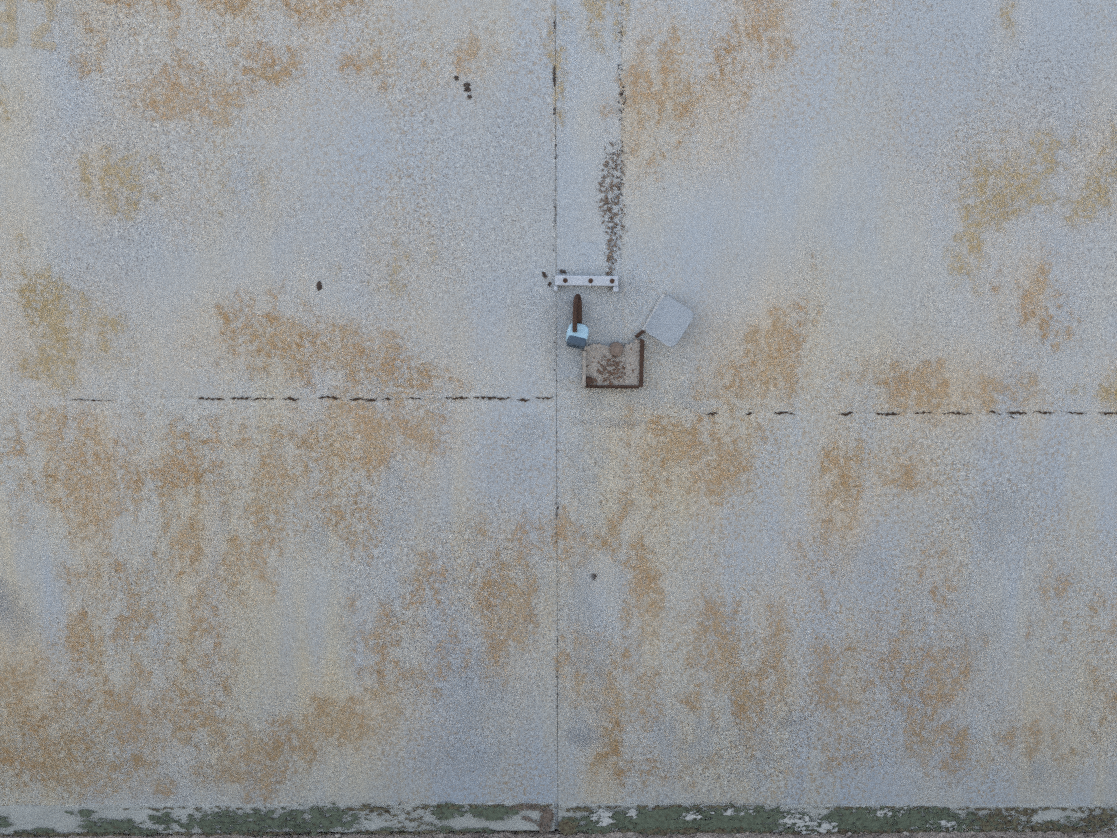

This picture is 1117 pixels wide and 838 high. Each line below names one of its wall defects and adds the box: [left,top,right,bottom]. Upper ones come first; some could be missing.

rust [147,44,301,123]
rust [950,133,1060,275]
rust [219,312,365,383]
rust [586,355,625,385]
rust [229,401,435,578]
rust [0,661,220,792]
rust [195,697,366,800]
peeling [64,801,1117,837]